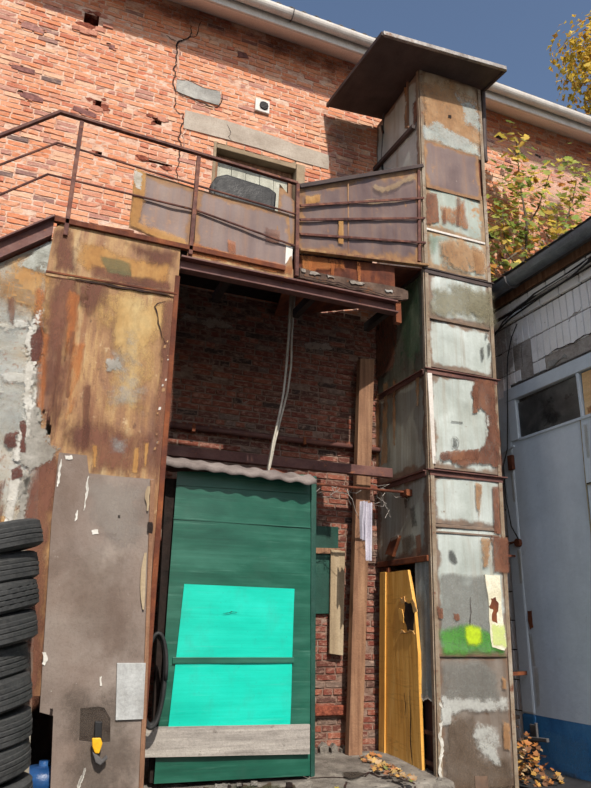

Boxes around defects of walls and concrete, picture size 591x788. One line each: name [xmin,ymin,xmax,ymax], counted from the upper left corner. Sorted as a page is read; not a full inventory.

spalling [72,9,116,51]
crack [166,21,223,182]
rust [404,81,480,145]
rust [130,169,289,273]
rust [426,192,468,229]
rust [302,256,344,275]
rust [0,230,175,473]
peeling [544,333,591,370]
peeling [4,310,61,522]
rust [440,379,502,467]
rust [481,487,509,573]
peeling [438,662,507,778]